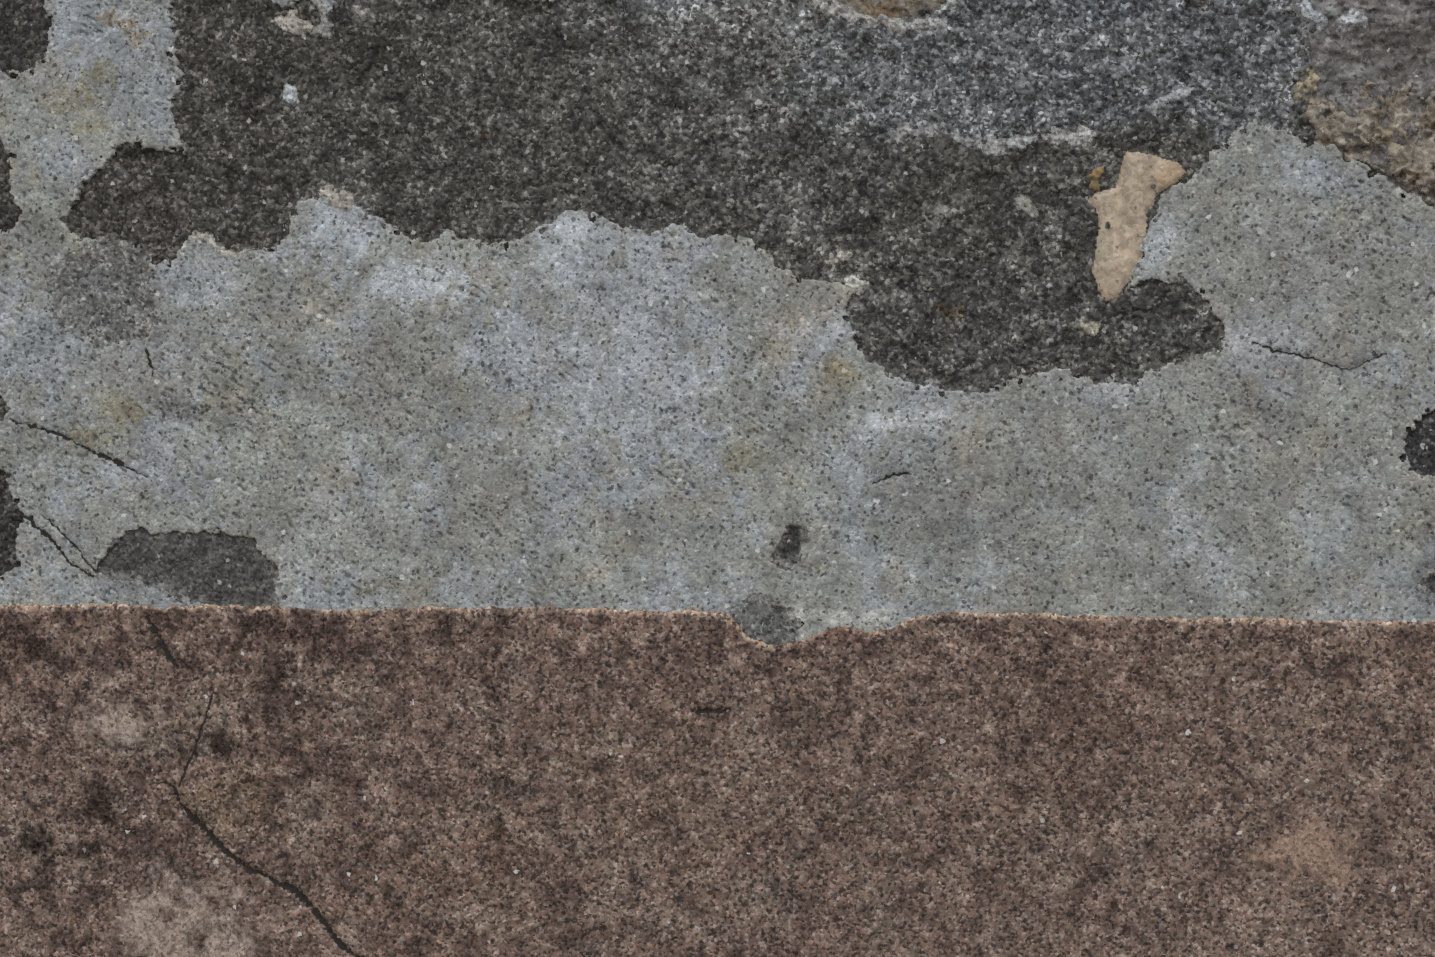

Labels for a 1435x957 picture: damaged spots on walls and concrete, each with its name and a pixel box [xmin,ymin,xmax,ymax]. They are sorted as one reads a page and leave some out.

spalling [0,0,53,77]
spalling [0,140,22,234]
spalling [44,0,1435,396]
spalling [1400,409,1435,476]
spalling [0,469,34,580]
spalling [93,527,287,606]
spalling [1415,575,1435,602]
crack [144,614,364,957]